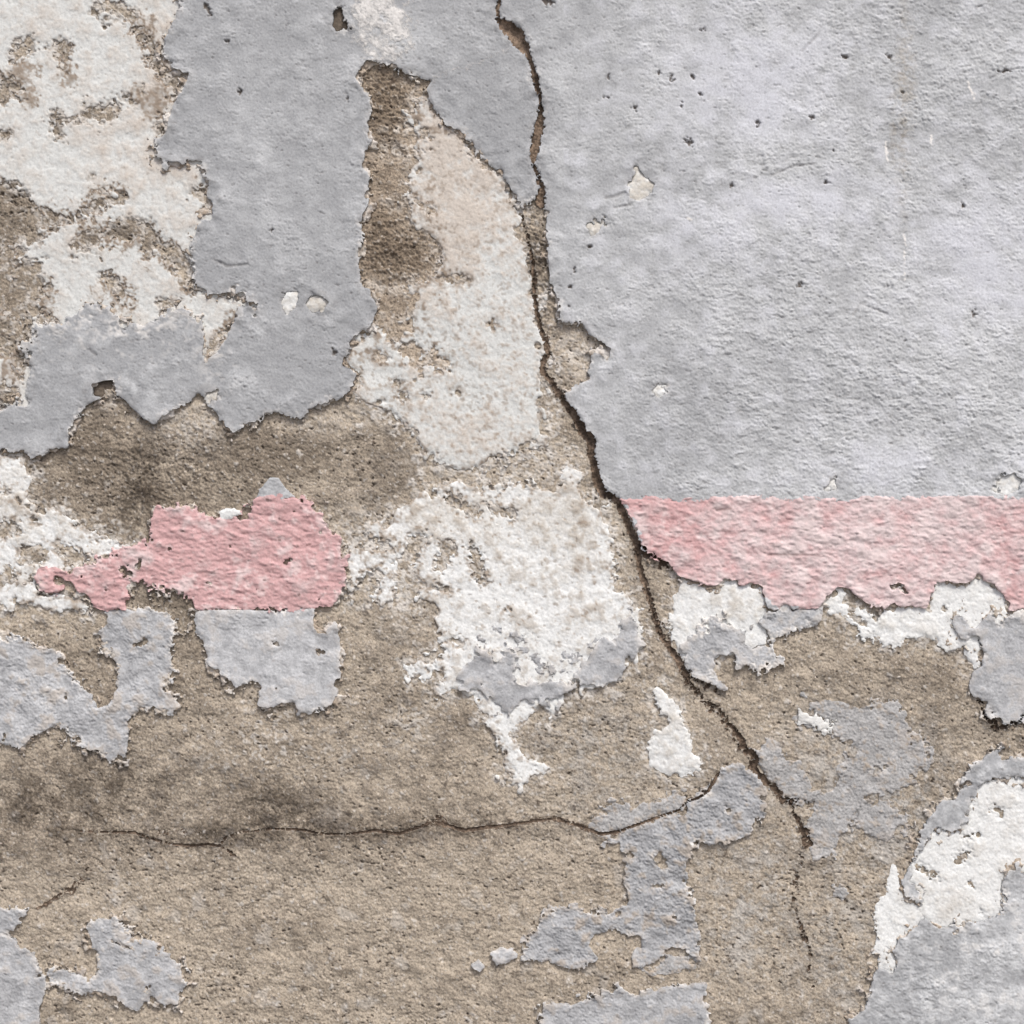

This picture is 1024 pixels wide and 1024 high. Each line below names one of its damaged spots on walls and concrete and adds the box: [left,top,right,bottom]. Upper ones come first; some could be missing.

peeling [0,0,258,410]
peeling [342,65,607,470]
crack [62,772,720,857]
spalling [0,372,1024,1024]
crack [495,0,817,988]